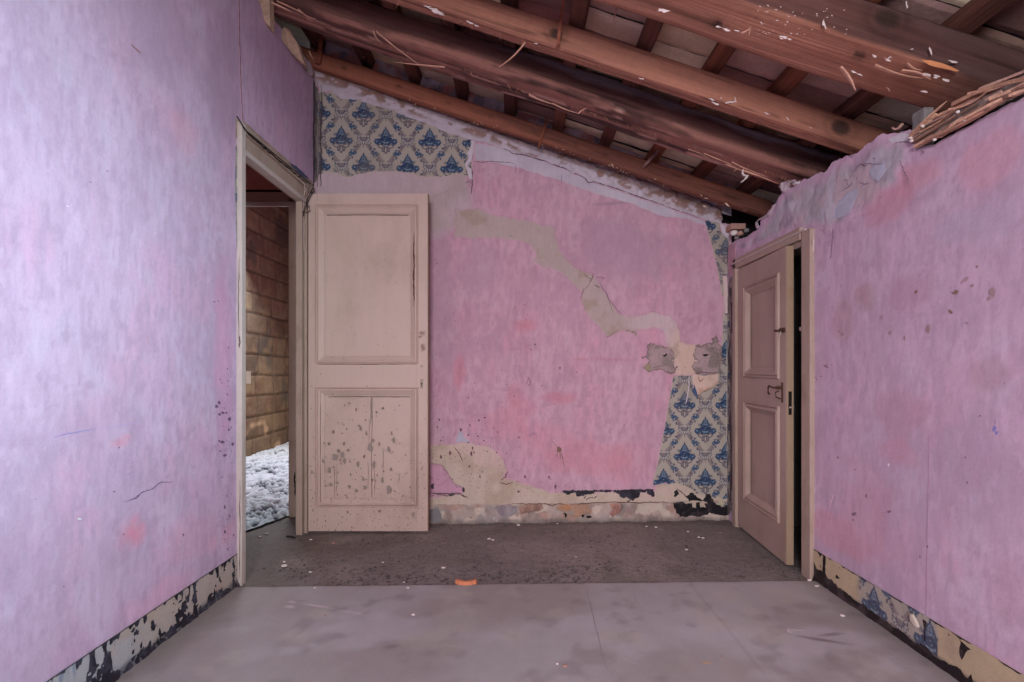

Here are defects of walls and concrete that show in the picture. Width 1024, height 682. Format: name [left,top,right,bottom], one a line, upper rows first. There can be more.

spalling [313,70,776,233]
spalling [779,180,801,193]
spalling [642,343,678,375]
spalling [691,336,723,375]
spalling [429,431,729,524]
peeling [47,553,239,682]
peeling [812,549,973,682]